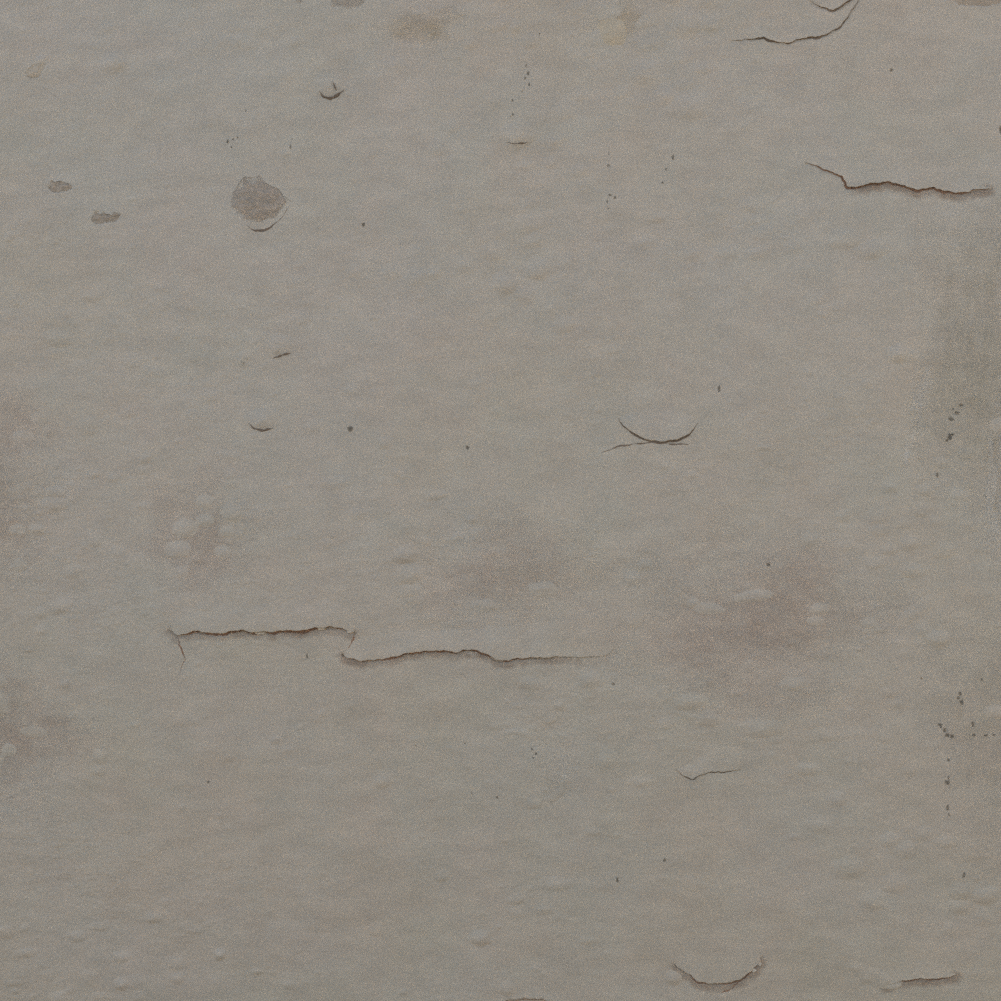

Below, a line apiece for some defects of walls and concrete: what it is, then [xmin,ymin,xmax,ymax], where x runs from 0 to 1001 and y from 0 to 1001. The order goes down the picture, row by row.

crack [806,151,991,195]